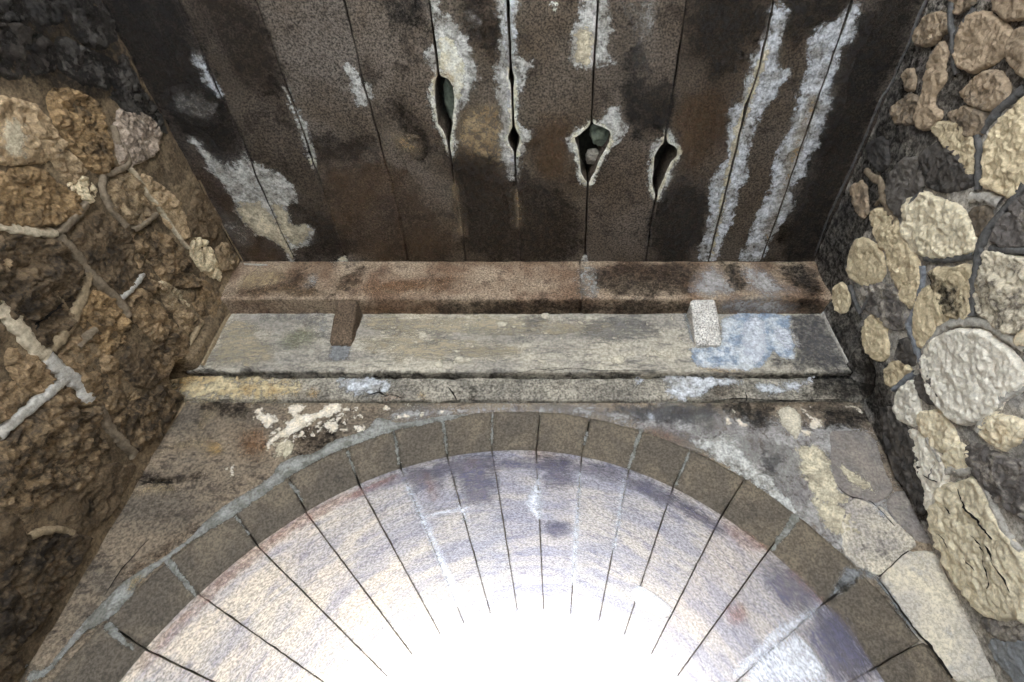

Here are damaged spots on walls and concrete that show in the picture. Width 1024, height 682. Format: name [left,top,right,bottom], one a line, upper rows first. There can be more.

water stain [103,0,377,262]
spalling [428,70,459,153]
spalling [565,107,629,186]
spalling [647,128,683,201]
water stain [170,0,920,564]
water stain [373,456,763,606]
crack [923,462,1009,591]